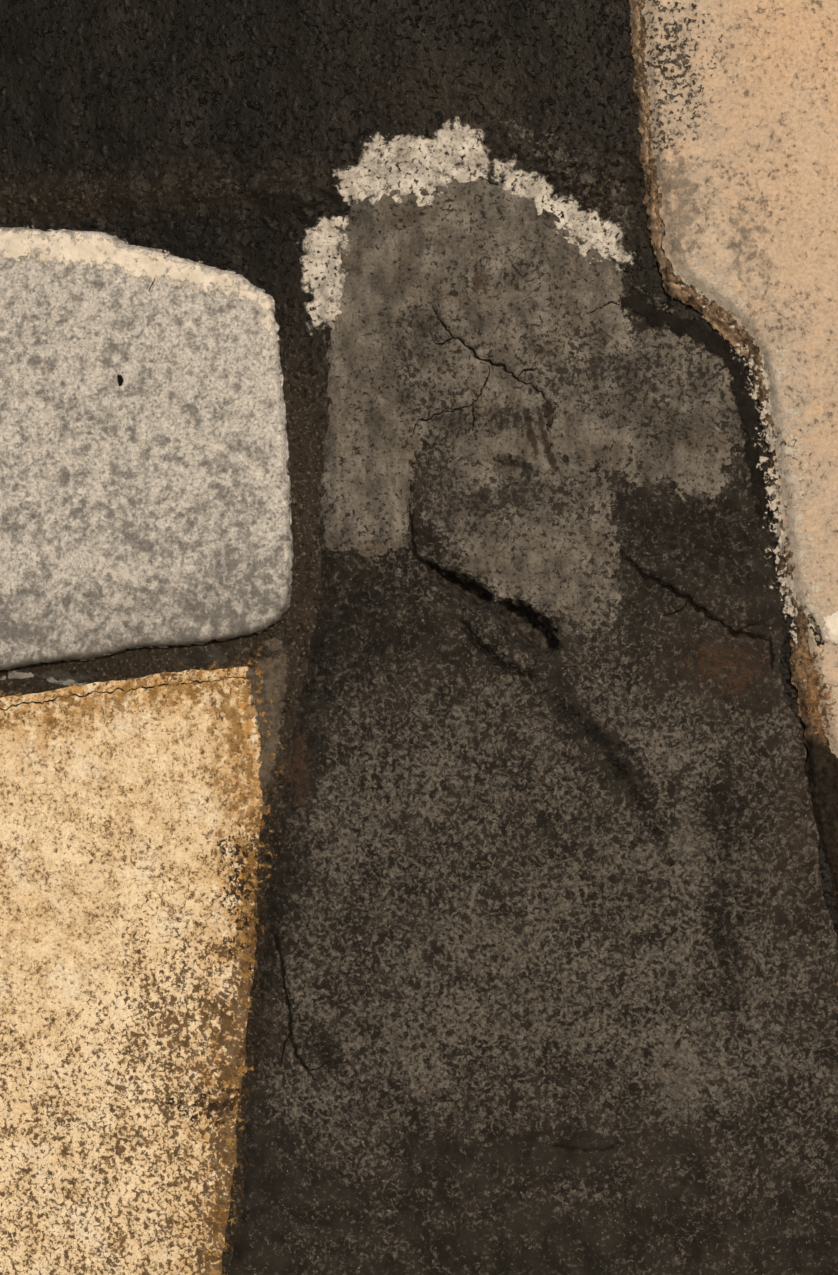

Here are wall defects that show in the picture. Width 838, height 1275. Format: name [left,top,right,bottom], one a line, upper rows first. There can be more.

crack [411,305,546,436]
crack [407,483,432,568]
crack [620,551,775,670]
crack [274,936,331,1089]